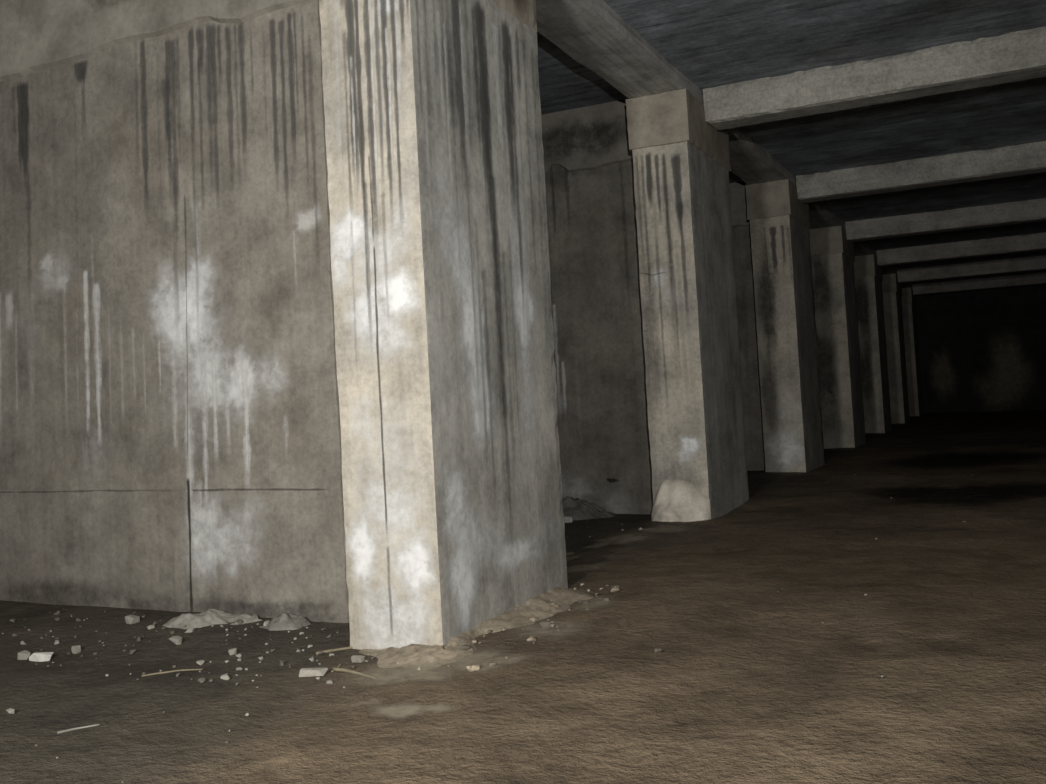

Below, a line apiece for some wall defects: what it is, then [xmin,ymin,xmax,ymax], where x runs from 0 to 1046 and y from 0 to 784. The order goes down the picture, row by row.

leakage [17,85,28,171]
leakage [83,271,101,440]
leakage [153,262,254,571]
leakage [270,14,295,166]
leakage [332,210,392,280]
leakage [346,0,403,204]
leakage [352,268,417,350]
leakage [437,0,464,162]
leakage [451,232,492,442]
leakage [474,6,521,366]
leakage [514,267,534,367]
leakage [646,155,683,232]